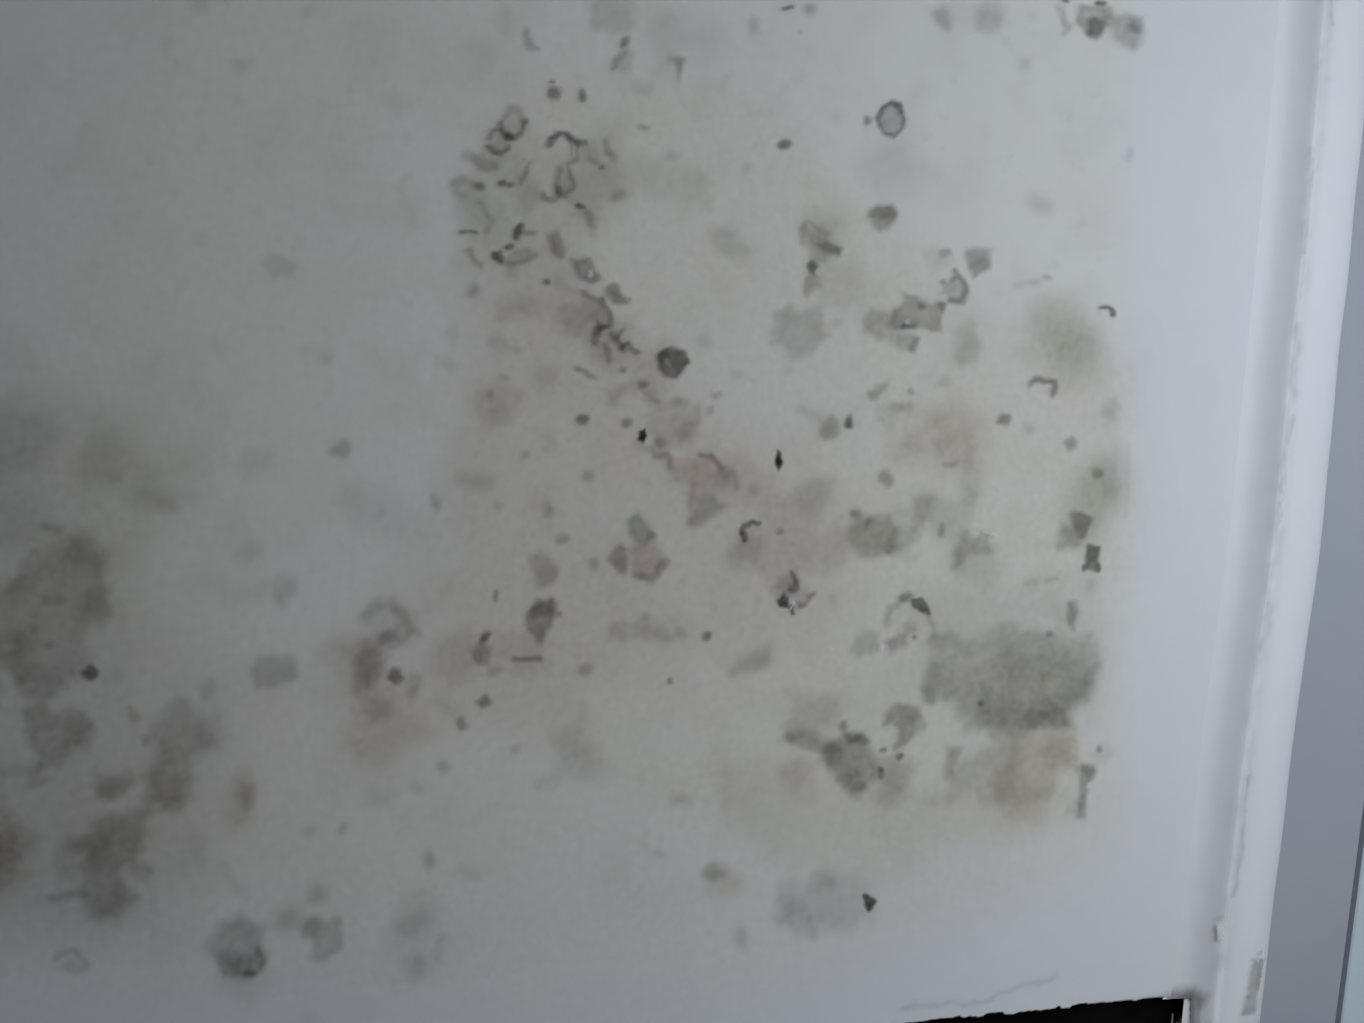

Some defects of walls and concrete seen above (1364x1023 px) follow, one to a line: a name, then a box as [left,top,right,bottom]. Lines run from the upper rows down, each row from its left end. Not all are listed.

damp [1076,517,1101,571]
damp [914,599,930,613]
damp [864,895,876,911]